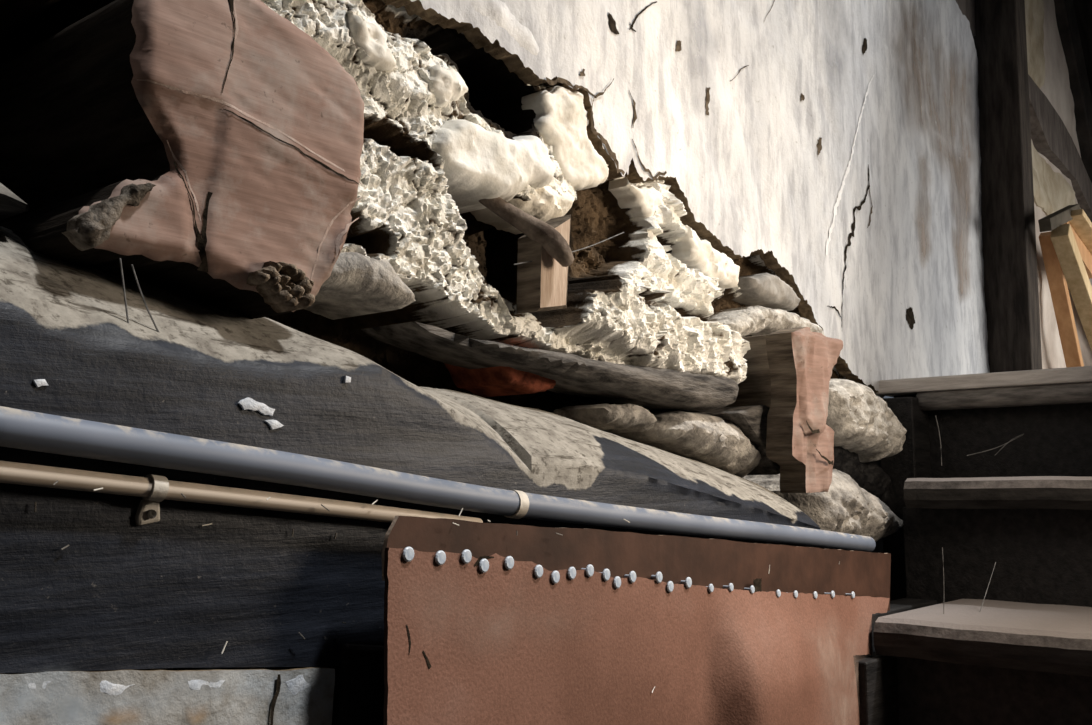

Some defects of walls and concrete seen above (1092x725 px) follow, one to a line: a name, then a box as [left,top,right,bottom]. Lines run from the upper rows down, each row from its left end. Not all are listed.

spalling [0,0,115,64]
spalling [261,0,780,413]
crack [829,164,873,317]
spalling [830,365,846,379]
crack [270,674,281,725]